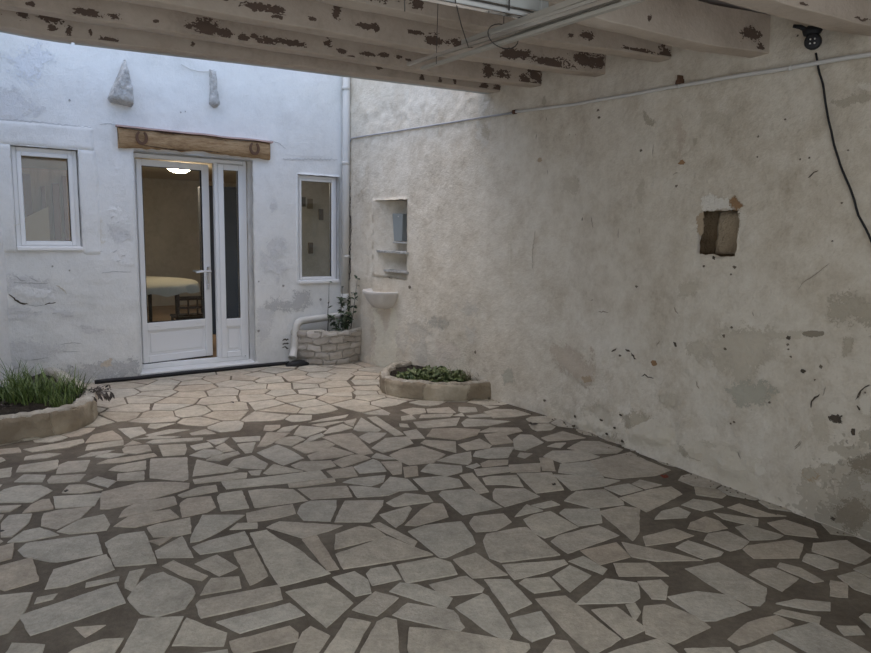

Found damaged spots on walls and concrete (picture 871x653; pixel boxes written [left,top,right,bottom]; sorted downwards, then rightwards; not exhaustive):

peeling [16,1,72,36]
peeling [72,7,122,20]
peeling [184,17,307,48]
peeling [238,1,286,20]
peeling [323,37,411,70]
peeling [355,22,380,33]
peeling [407,29,473,48]
peeling [621,44,671,56]
peeling [739,25,765,50]
peeling [478,47,606,116]
peeling [696,193,748,240]
damp [778,413,871,541]